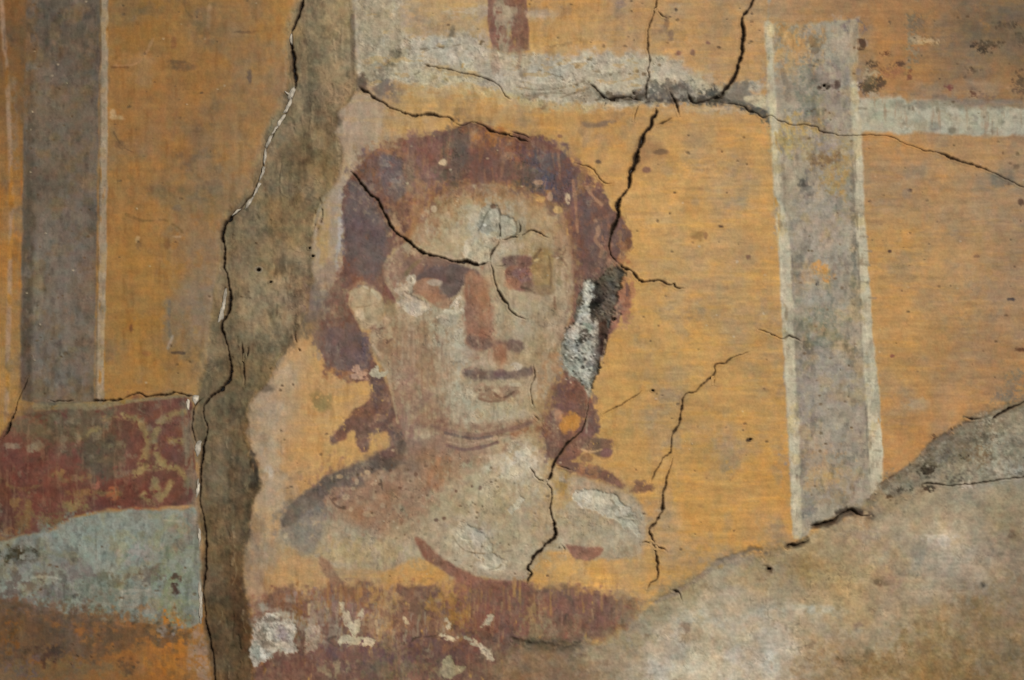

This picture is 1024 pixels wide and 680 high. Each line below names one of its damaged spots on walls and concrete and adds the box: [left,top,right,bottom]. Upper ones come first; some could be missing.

crack [356,84,532,144]
crack [422,61,513,102]
crack [574,0,1024,291]
crack [348,169,550,322]
crack [0,0,306,680]
flaking render [561,267,627,394]
crack [524,388,644,586]
peeling [572,489,641,537]
crack [640,327,804,602]
flaking render [879,401,1024,497]